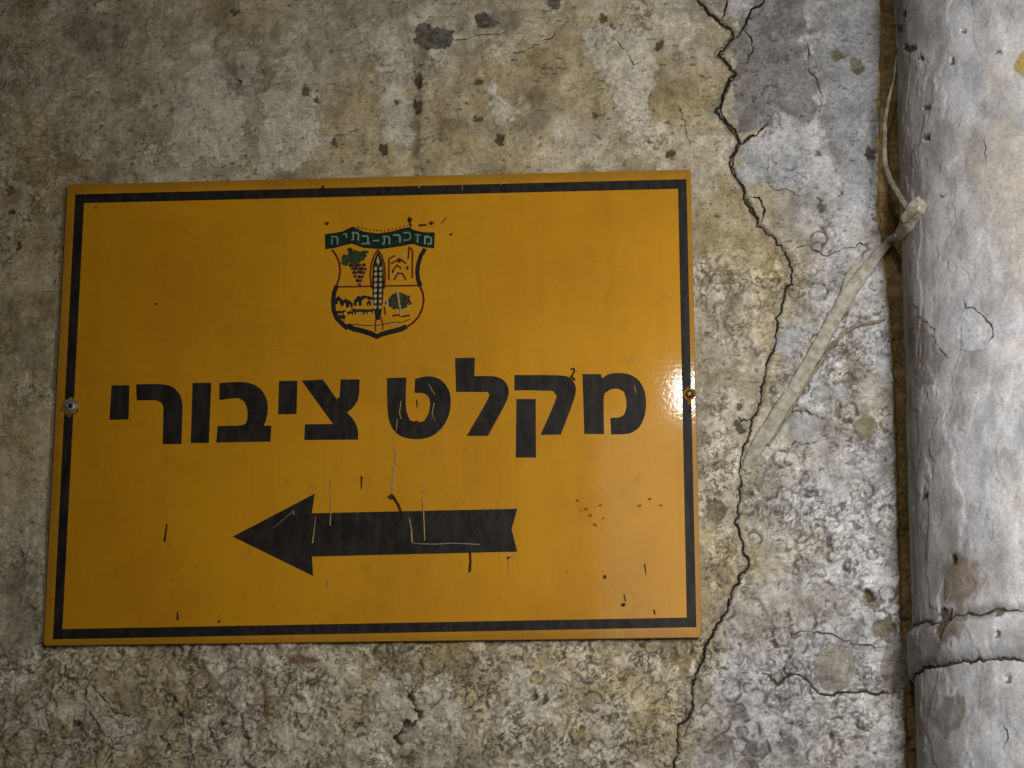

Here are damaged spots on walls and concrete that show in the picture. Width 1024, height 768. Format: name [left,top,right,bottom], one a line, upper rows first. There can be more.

crack [672,0,878,768]
crack [910,607,1023,630]
crack [761,657,1024,697]